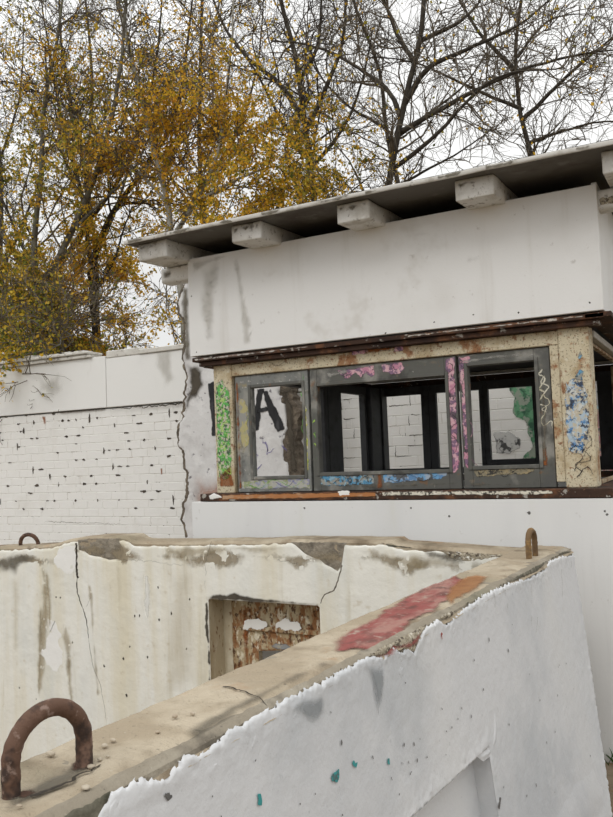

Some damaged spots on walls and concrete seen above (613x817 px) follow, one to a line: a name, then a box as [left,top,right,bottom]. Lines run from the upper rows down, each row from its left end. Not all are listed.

leakage [0,556,28,570]
spalling [78,538,122,560]
spalling [291,542,347,571]
crack [321,565,342,602]
spalling [442,551,502,561]
spalling [500,551,571,586]
leakage [40,582,50,639]
crack [75,543,106,715]
peeling [223,600,232,674]
peeling [243,618,302,632]
spalling [369,624,426,656]
spalling [65,791,110,817]